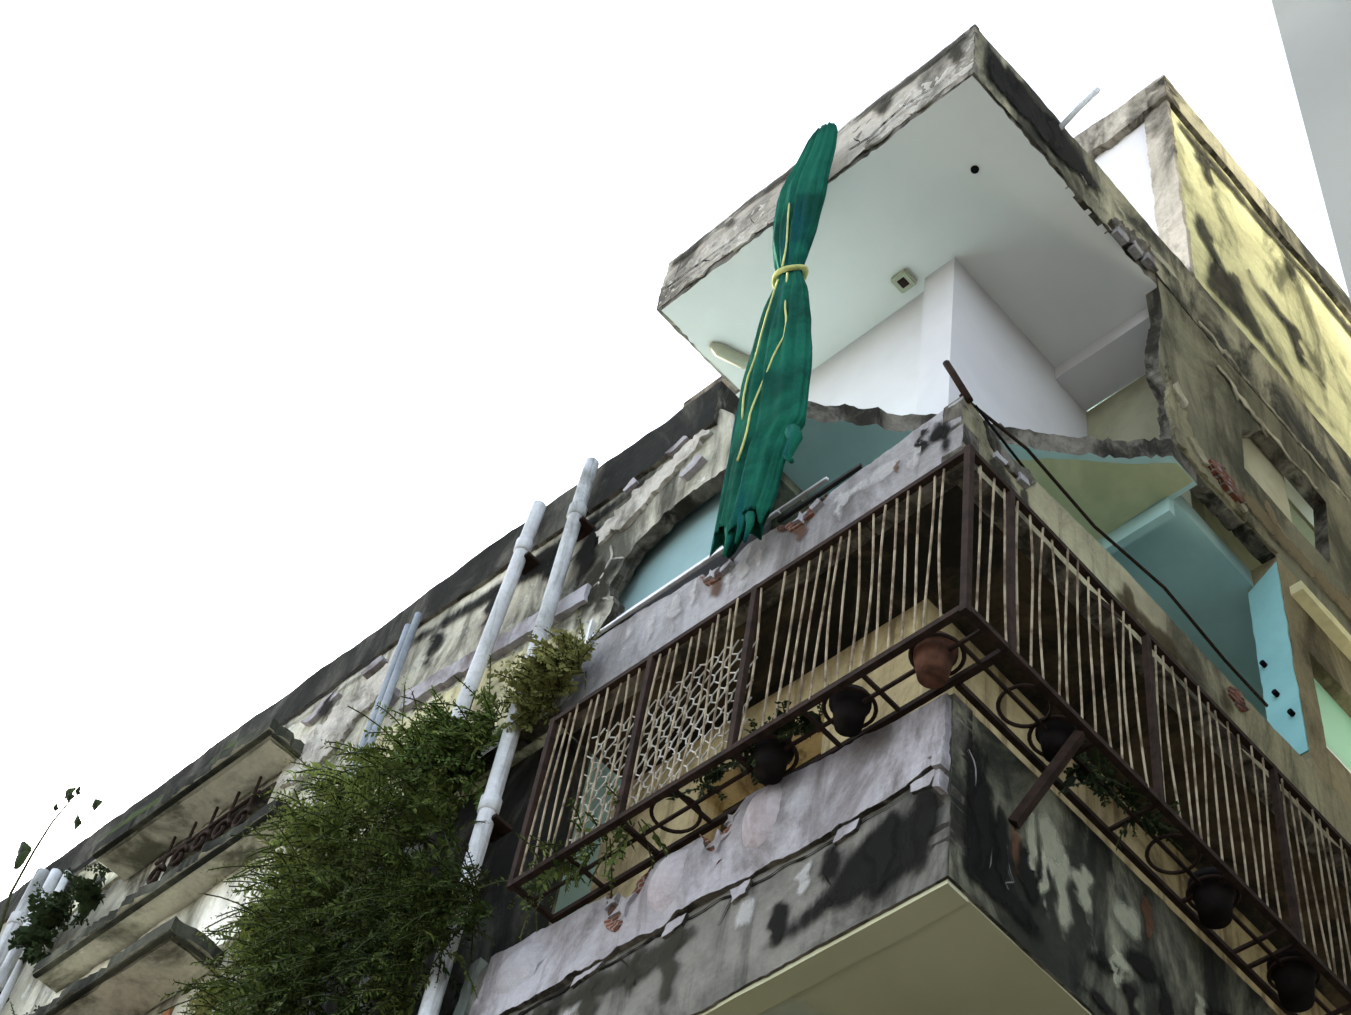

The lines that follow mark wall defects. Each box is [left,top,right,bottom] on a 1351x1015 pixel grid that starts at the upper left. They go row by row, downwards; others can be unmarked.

water stain [840,33,966,131]
water stain [988,47,1100,201]
water stain [672,165,795,266]
mould [1196,214,1326,393]
mould [1179,121,1351,335]
peeling [595,429,713,547]
spalling [699,559,735,587]
peeling [470,693,952,1015]
water stain [766,788,937,945]
water stain [963,731,1093,936]
water stain [532,924,693,1015]
water stain [1083,905,1174,1015]